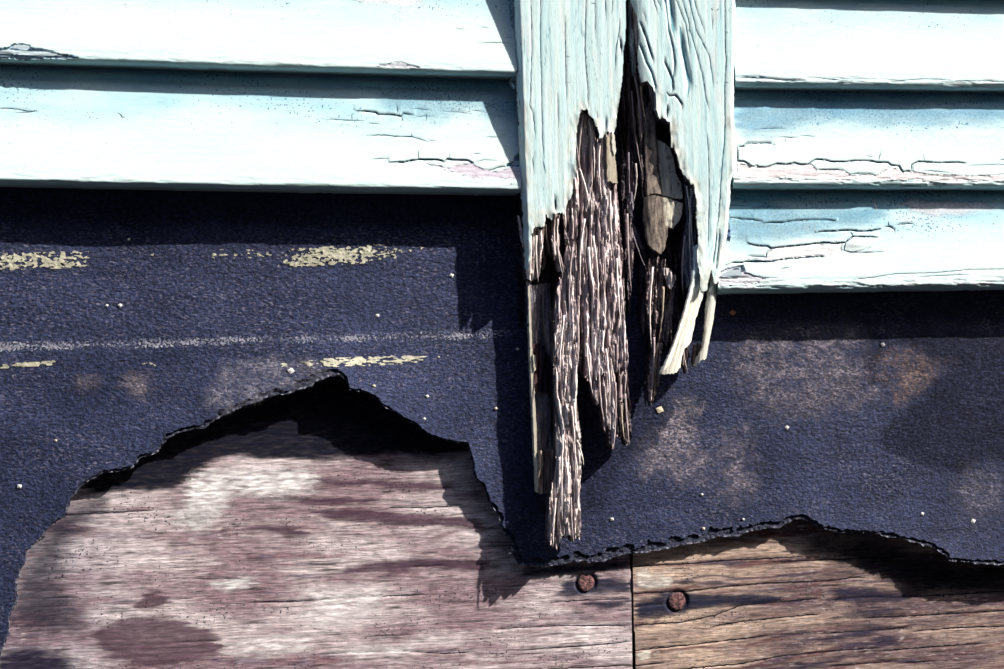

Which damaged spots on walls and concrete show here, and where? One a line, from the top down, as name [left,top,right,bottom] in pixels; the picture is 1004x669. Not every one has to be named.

crack [335,103,512,185]
peeling [605,134,618,184]
crack [530,0,1004,287]
damp [736,324,1004,509]
damp [724,447,752,492]
damp [251,526,310,534]
damp [265,495,495,531]
damp [15,507,99,625]
damp [345,559,493,573]
damp [92,591,222,666]
damp [0,648,75,669]